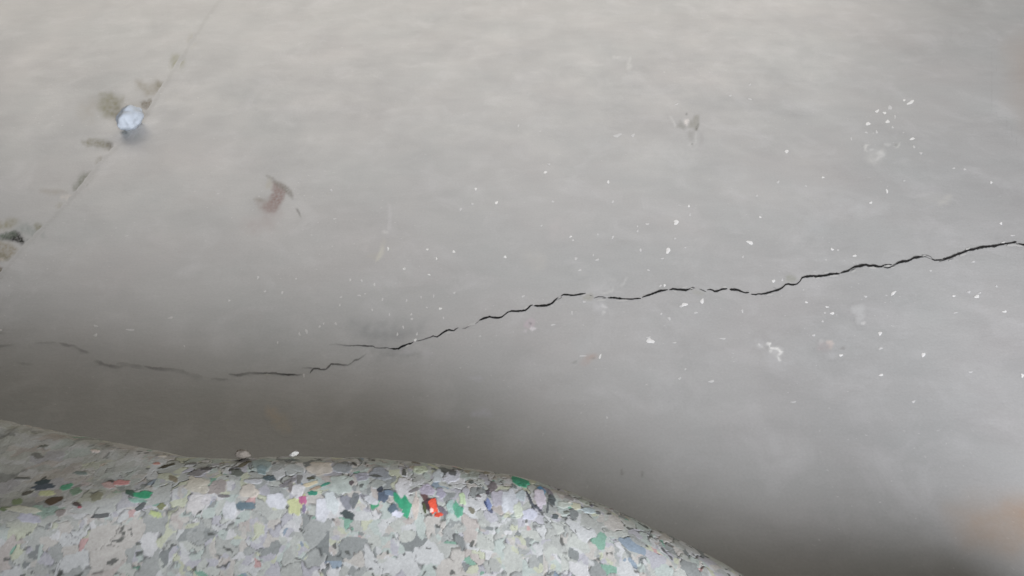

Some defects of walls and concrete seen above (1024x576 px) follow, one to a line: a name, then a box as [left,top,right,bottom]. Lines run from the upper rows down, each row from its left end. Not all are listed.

crack [0,241,1024,381]